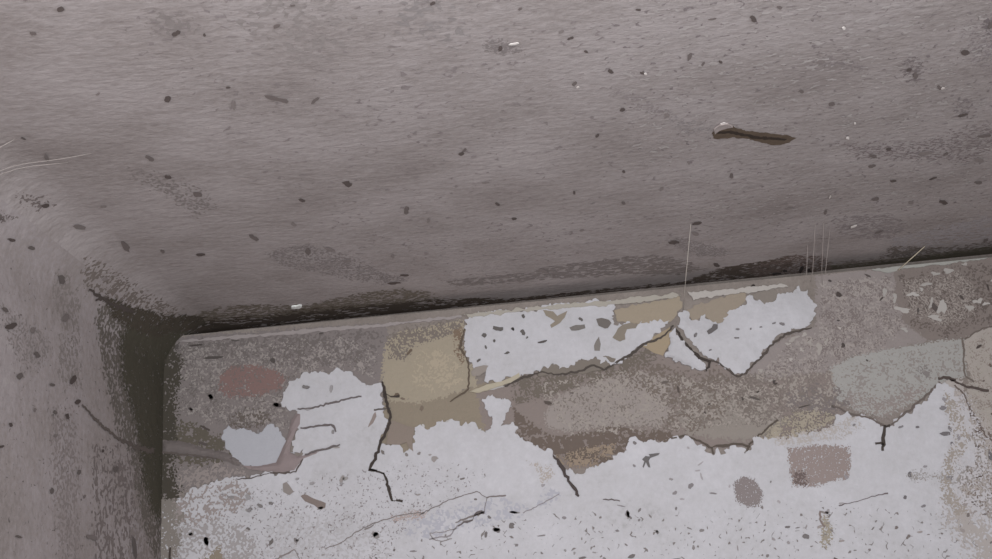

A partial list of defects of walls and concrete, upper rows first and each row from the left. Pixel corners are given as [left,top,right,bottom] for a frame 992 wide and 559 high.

crack [450,323,470,402]
crack [504,325,812,387]
peeling [161,258,992,559]
crack [237,381,506,550]
crack [523,455,579,514]